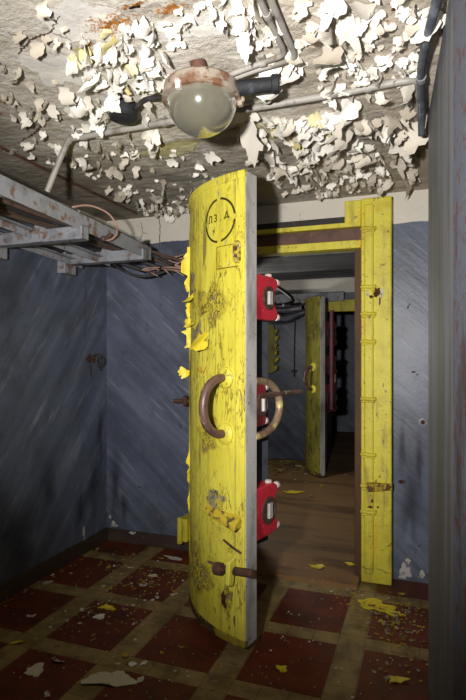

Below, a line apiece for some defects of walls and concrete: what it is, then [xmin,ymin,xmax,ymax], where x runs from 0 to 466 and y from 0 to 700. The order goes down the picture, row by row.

rust [85,0,147,34]
rust [156,2,186,18]
peeling [0,0,446,223]
flaking render [399,558,425,579]